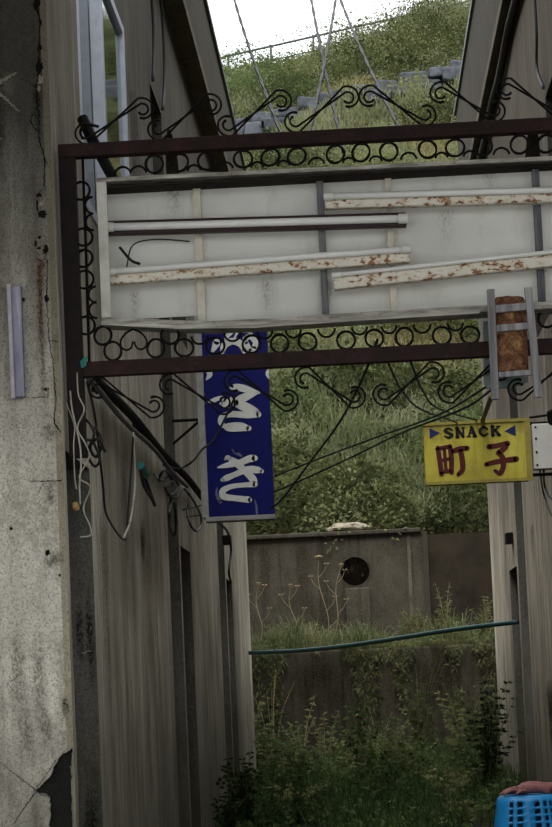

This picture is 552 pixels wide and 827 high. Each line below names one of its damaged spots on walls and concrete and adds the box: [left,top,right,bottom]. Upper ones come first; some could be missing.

crack [6,759,57,825]
peeling [35,746,74,827]